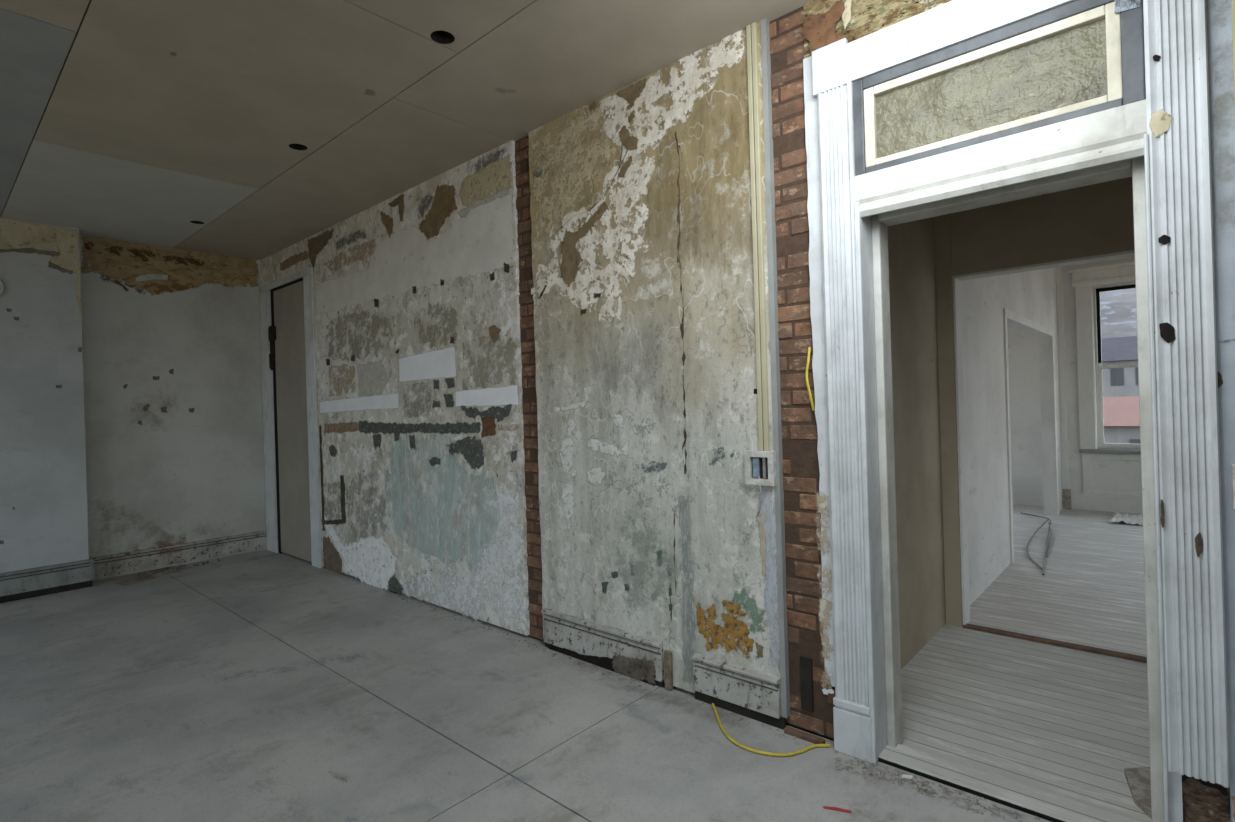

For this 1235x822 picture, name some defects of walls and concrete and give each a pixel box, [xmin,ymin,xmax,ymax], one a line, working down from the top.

peeling [0,218,259,318]
spalling [280,194,404,272]
peeling [326,299,399,397]
peeling [403,30,746,640]
spalling [373,432,415,450]
peeling [319,425,404,595]